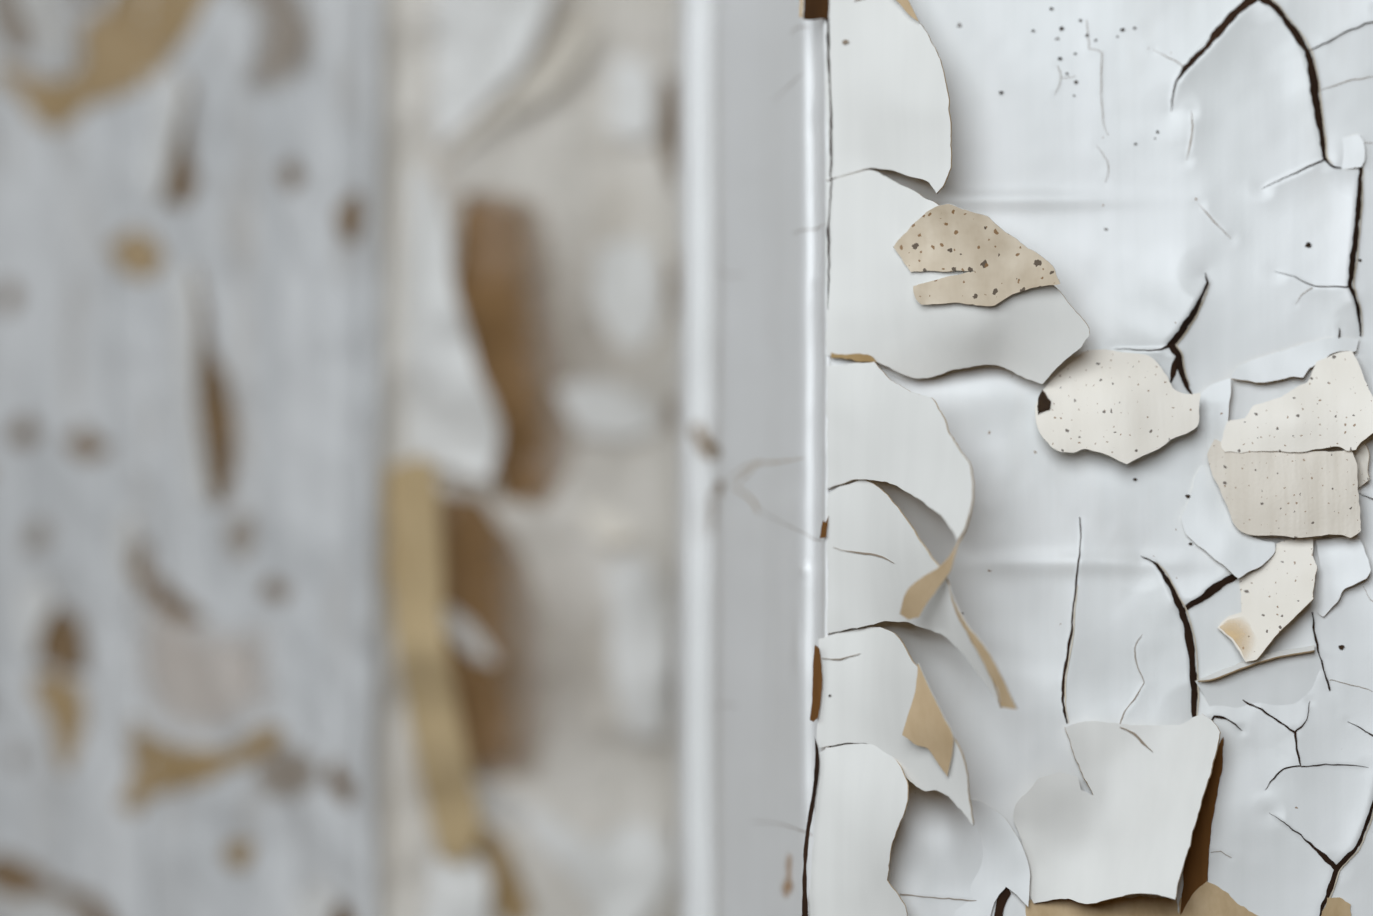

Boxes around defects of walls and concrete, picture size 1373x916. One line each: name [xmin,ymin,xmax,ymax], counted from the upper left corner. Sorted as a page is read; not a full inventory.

crack [1055,20,1109,182]
crack [1153,0,1373,338]
crack [1130,273,1210,394]
peeling [808,0,1373,916]
crack [1061,517,1081,724]
crack [1120,635,1153,752]
crack [1141,556,1373,916]